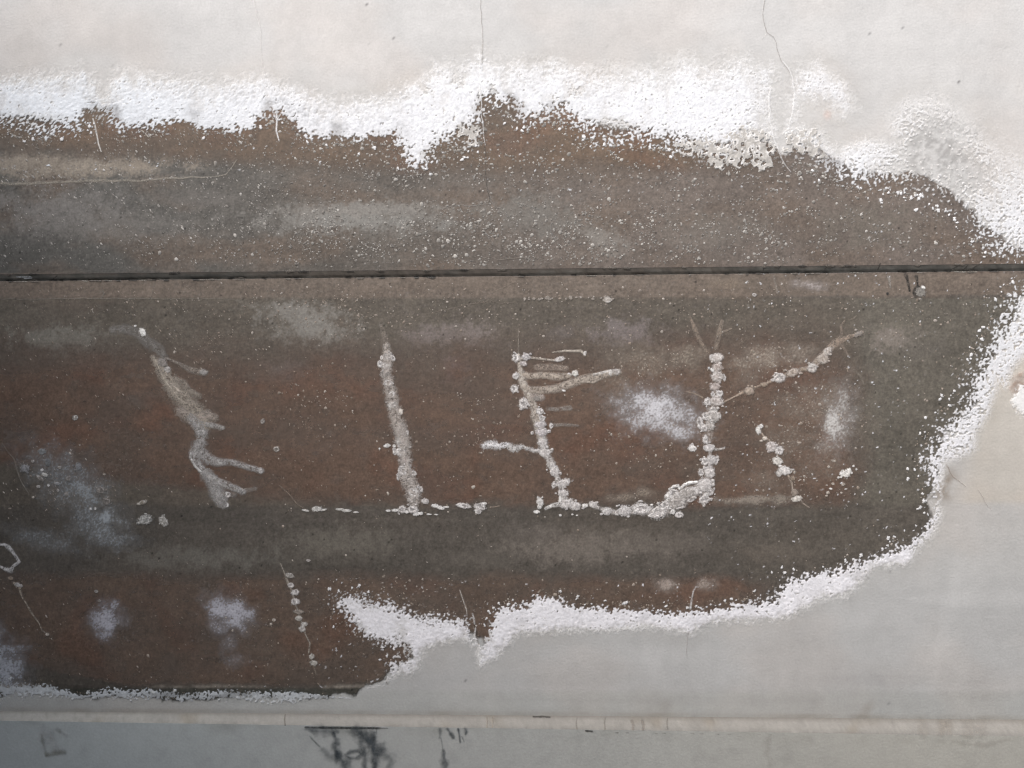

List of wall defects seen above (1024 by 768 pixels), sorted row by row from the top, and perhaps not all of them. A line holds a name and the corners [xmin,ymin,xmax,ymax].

corrosion [0,93,761,170]
peeling [457,122,481,147]
leakage [0,58,1024,274]
peeling [674,125,828,170]
corrosion [0,337,860,508]
leakage [0,271,1024,705]
corrosion [0,572,759,686]